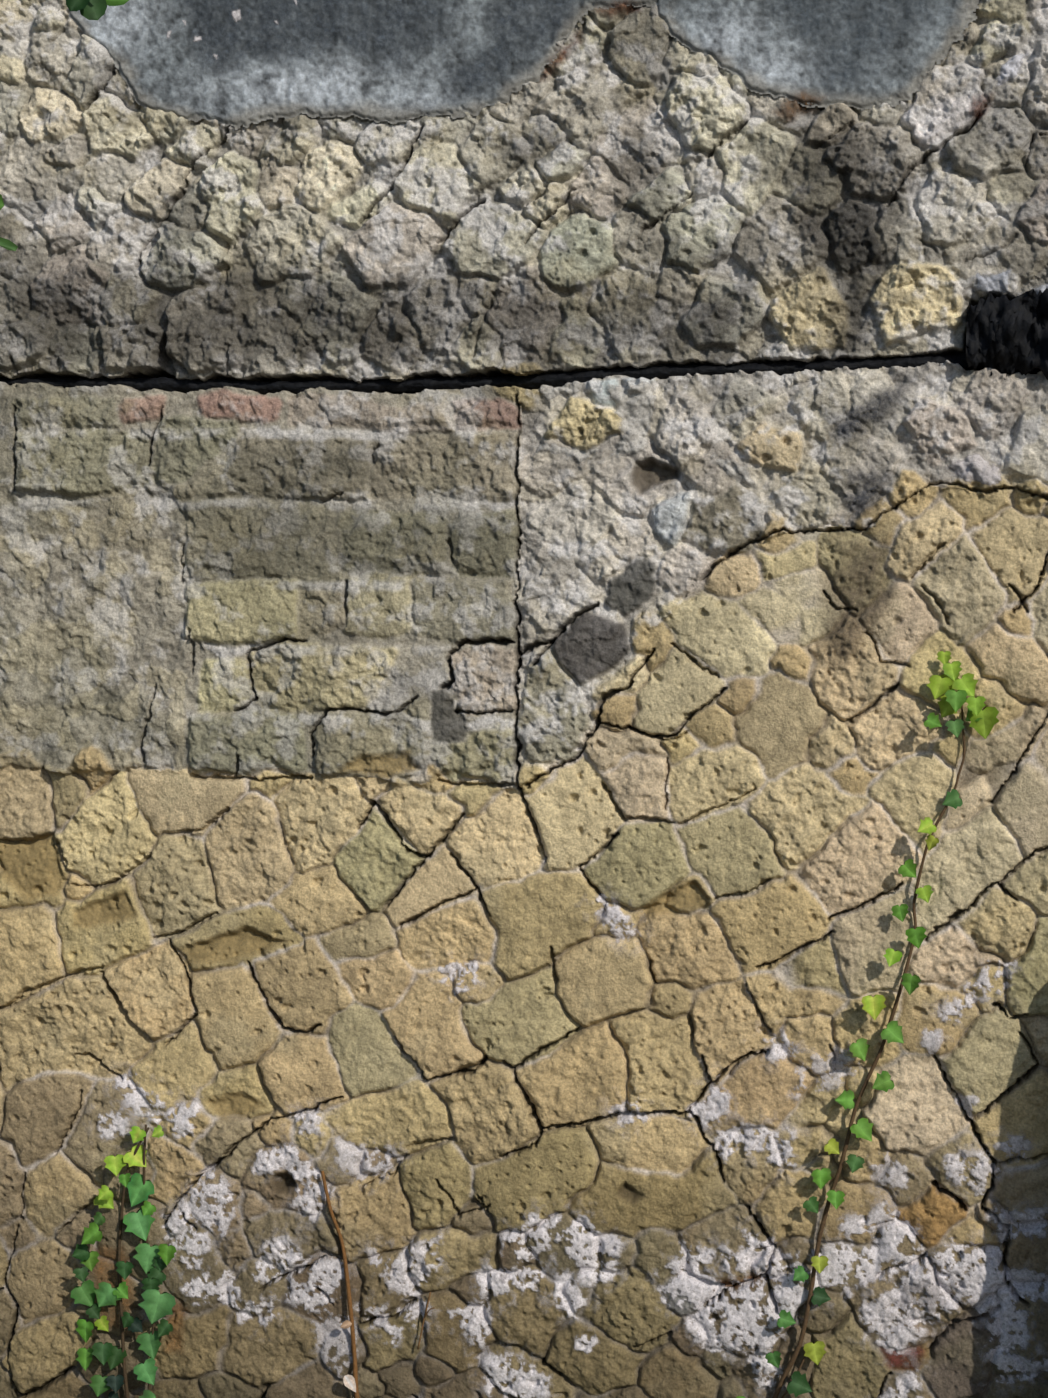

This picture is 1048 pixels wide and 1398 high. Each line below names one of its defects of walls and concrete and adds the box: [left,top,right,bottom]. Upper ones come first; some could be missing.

flaking render [973,270,1010,298]
efflorescence [98,1071,202,1139]
efflorescence [252,1108,335,1223]
efflorescence [335,1136,402,1179]
efflorescence [609,1101,648,1123]
efflorescence [686,1087,797,1170]
efflorescence [870,1156,908,1188]
efflorescence [944,1136,1029,1196]
efflorescence [162,1165,442,1374]
efflorescence [448,1212,624,1398]
efflorescence [655,1202,1048,1388]
efflorescence [880,1372,923,1398]